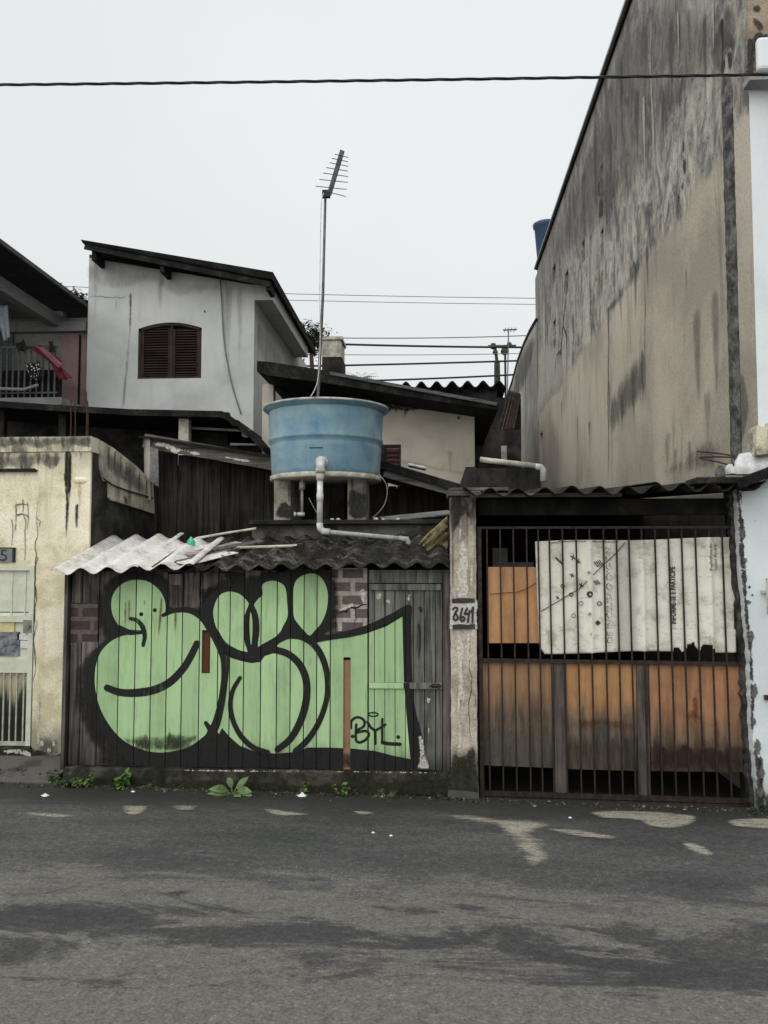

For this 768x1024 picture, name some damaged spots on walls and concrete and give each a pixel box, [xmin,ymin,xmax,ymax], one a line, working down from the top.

damp [702,3,732,74]
damp [635,9,664,175]
damp [608,354,643,423]
damp [0,436,90,530]
damp [108,447,147,493]
spalling [736,489,765,805]
peeling [389,728,429,773]